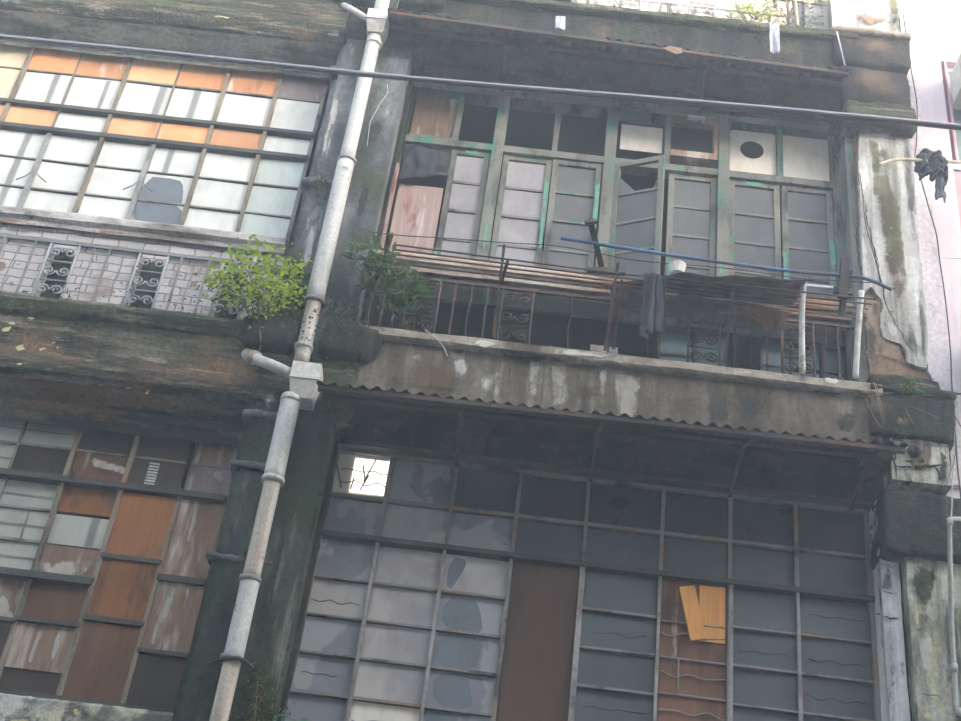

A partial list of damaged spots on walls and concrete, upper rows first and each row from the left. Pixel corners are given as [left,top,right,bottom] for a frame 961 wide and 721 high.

water stain [869,140,915,297]
water stain [507,355,539,395]
peeling [562,350,608,358]
water stain [580,369,640,417]
flaking render [862,291,907,365]
water stain [907,309,925,356]
water stain [943,604,961,694]